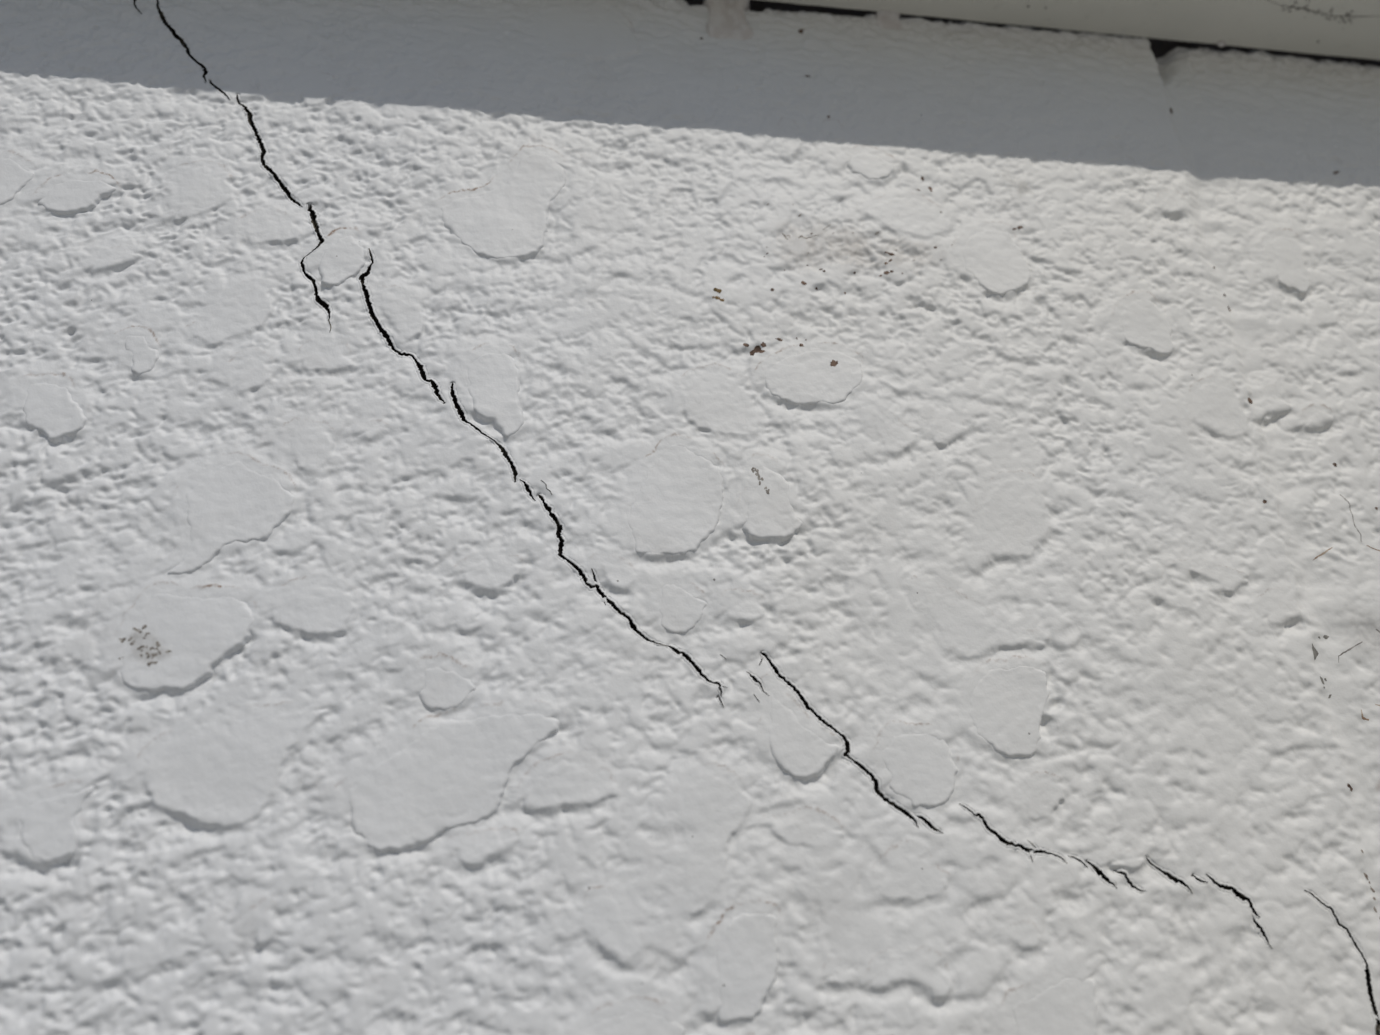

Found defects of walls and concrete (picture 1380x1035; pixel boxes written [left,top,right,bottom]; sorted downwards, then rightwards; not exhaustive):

peeling [743,337,807,356]
crack [131,0,1273,949]
crack [1304,889,1380,1035]